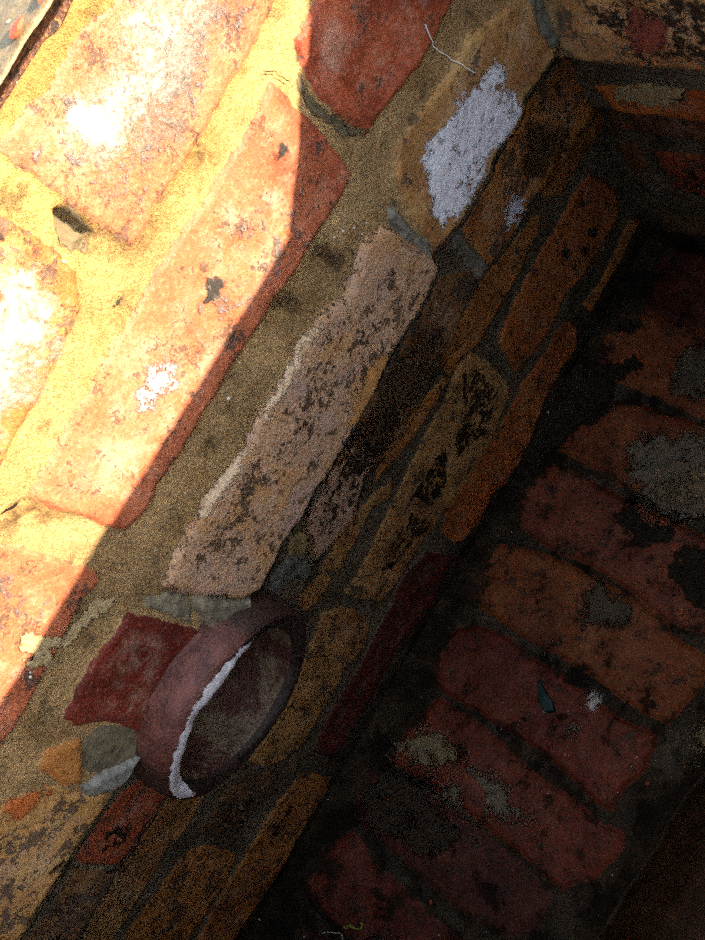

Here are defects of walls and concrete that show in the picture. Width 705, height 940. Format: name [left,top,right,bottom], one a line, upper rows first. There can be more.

damp [32,0,252,214]
damp [0,273,50,408]